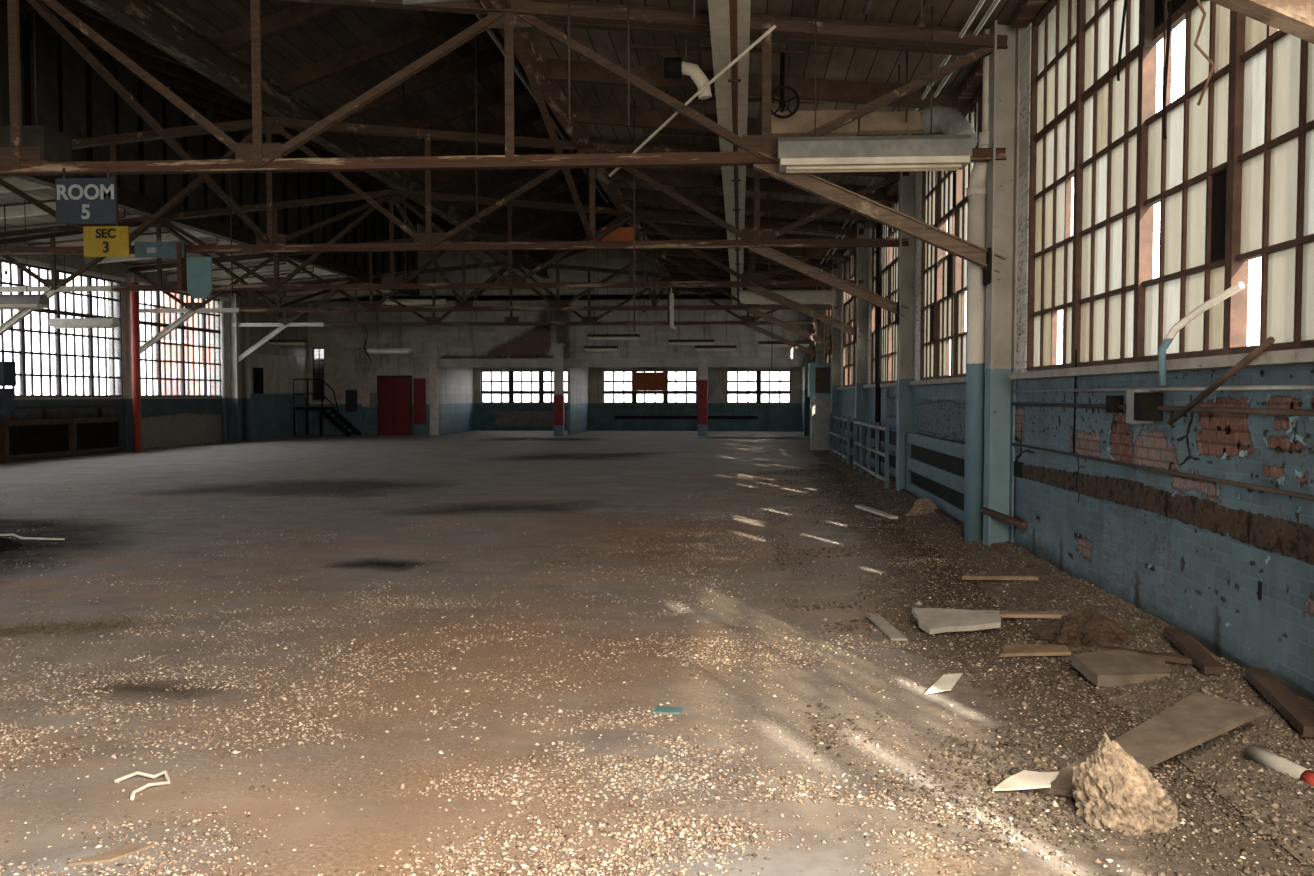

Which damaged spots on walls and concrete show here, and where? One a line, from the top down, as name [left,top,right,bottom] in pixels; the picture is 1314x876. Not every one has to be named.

spalling [1014,370,1314,600]
crack [1176,395,1199,466]